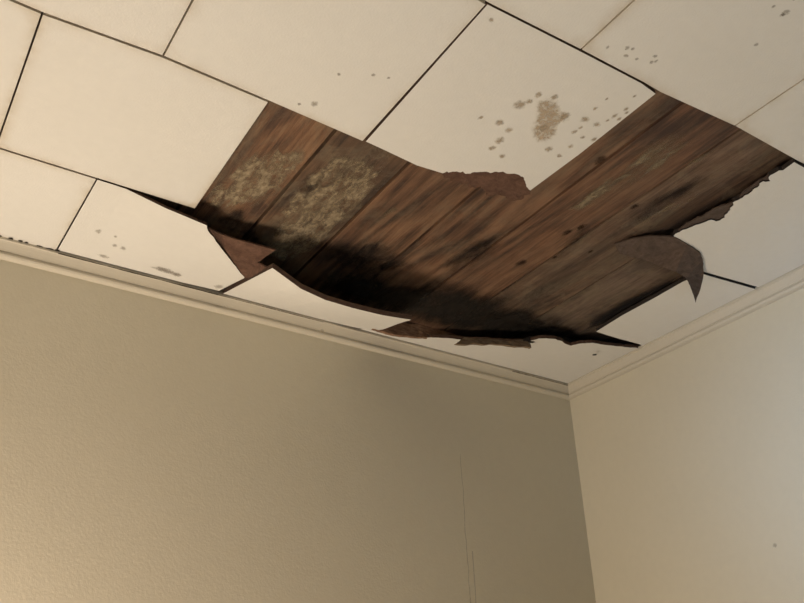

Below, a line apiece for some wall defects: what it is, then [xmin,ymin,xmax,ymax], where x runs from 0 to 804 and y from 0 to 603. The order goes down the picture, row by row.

water stain [516,93,568,140]
water stain [212,151,299,245]
water stain [270,158,377,260]
water stain [332,244,583,340]
water stain [450,238,494,264]
water stain [592,282,672,326]